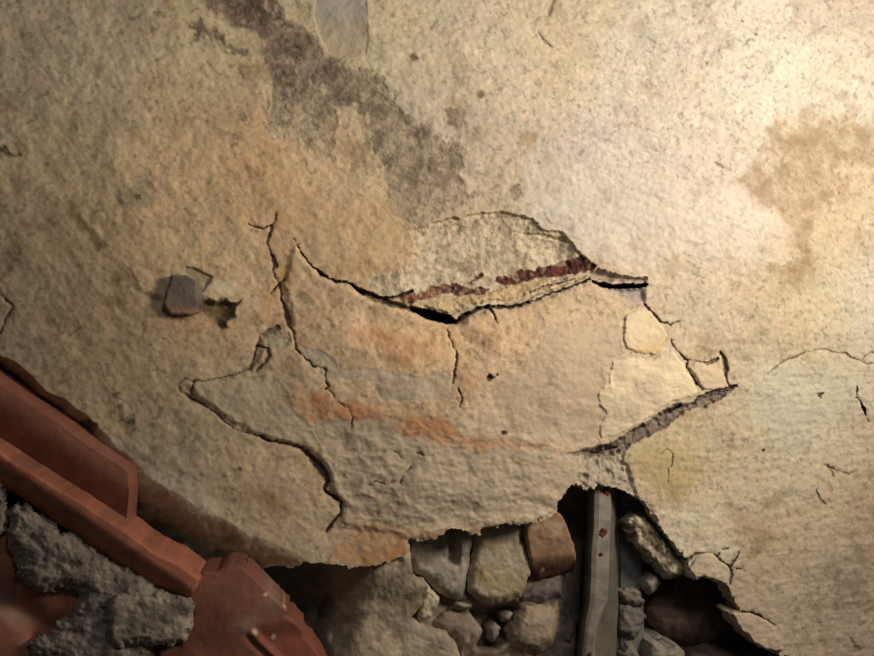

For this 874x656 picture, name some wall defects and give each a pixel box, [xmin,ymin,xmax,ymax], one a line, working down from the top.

crack [177,210,353,533]
peeling [184,0,726,439]
rust [397,255,598,305]
crack [293,238,738,486]
damp [732,99,874,297]
crack [767,349,874,374]
crack [856,385,869,422]
spalling [574,450,730,585]